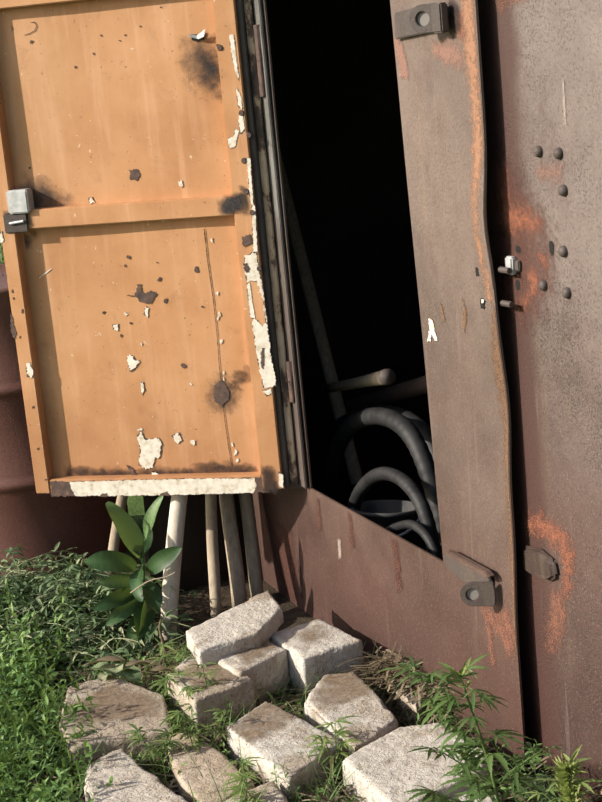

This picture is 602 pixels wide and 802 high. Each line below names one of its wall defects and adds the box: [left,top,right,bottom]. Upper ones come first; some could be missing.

peeling [216,35,245,149]
peeling [242,157,277,397]
rust [497,170,551,325]
peeling [45,428,268,497]
rust [66,462,278,493]
rust [525,514,575,649]